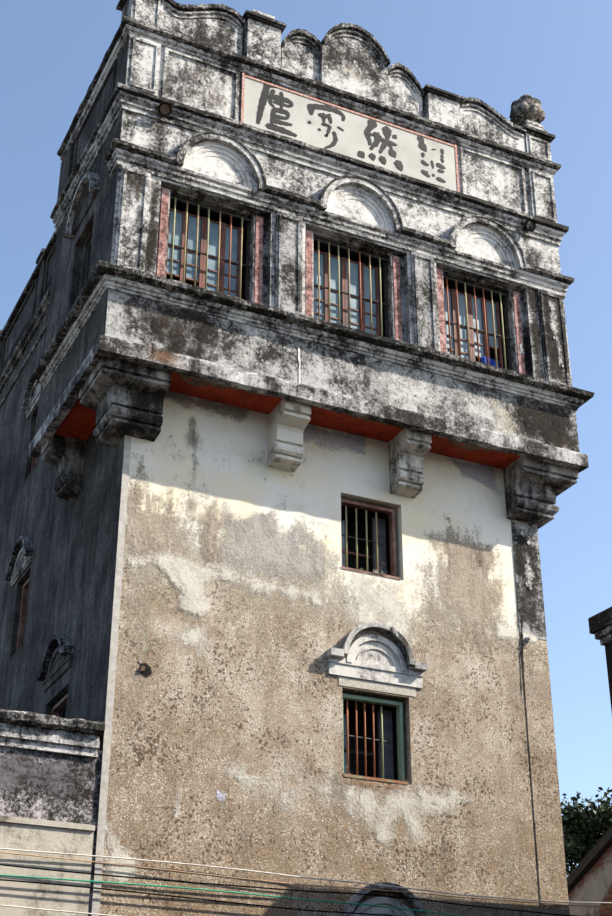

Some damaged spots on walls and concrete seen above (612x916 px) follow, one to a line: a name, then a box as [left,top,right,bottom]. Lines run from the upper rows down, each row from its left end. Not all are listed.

water stain [177,134,264,192]
water stain [125,295,219,358]
water stain [529,291,566,383]
water stain [165,391,248,421]
water stain [303,424,366,454]
water stain [515,396,576,451]
water stain [454,462,496,488]
water stain [125,453,229,570]
water stain [417,514,537,654]
water stain [340,578,415,667]